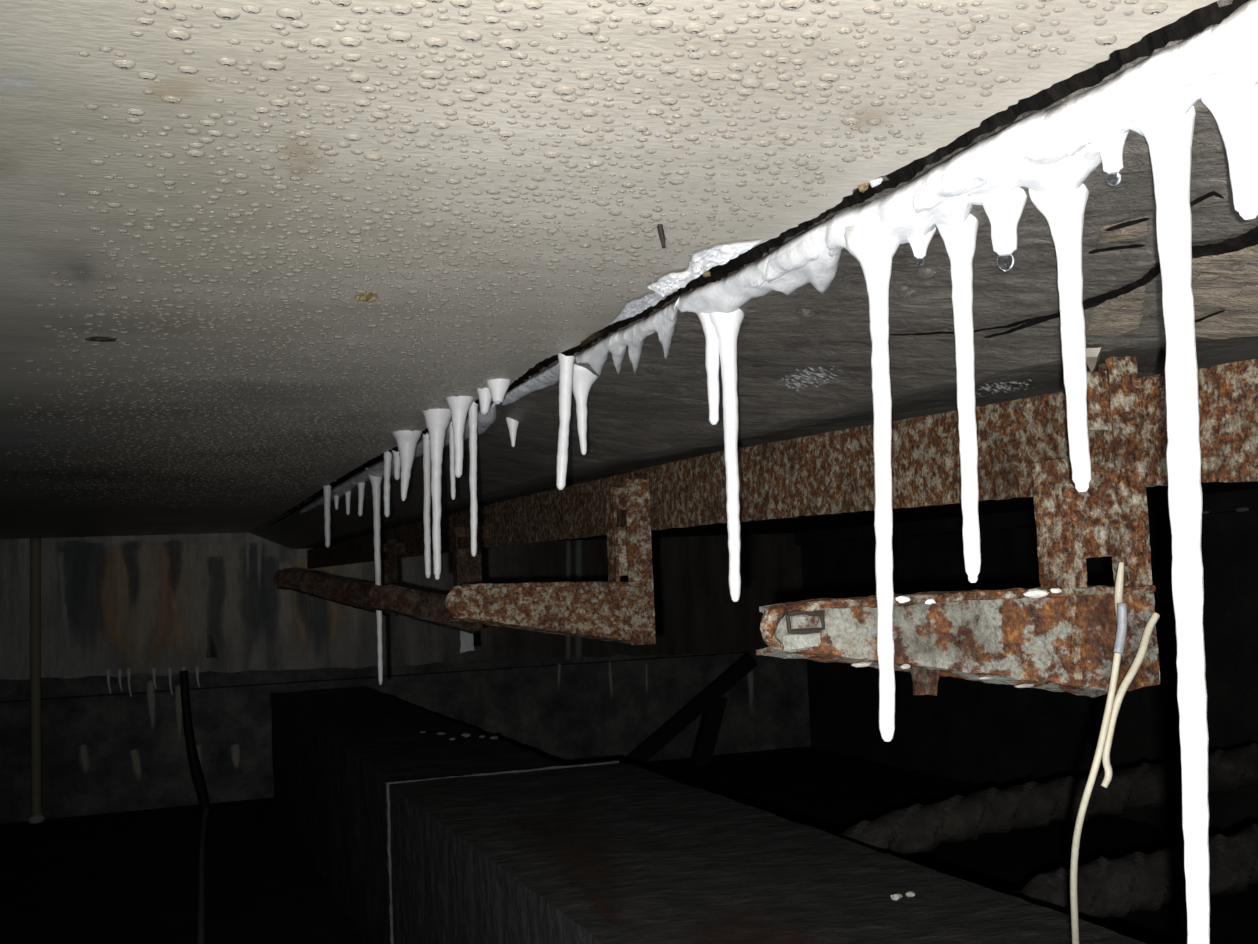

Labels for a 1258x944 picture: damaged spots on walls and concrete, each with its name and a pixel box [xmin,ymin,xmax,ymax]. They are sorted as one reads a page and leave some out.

crack [474,0,1258,404]
efflorescence [575,0,1258,377]
efflorescence [444,362,559,447]
efflorescence [782,366,837,391]
efflorescence [975,379,1035,397]
crack [269,428,428,526]
efflorescence [300,455,401,515]
efflorescence [414,438,429,458]
corrosion [1061,482,1084,523]
corrosion [274,556,364,648]
damp [1024,588,1062,598]